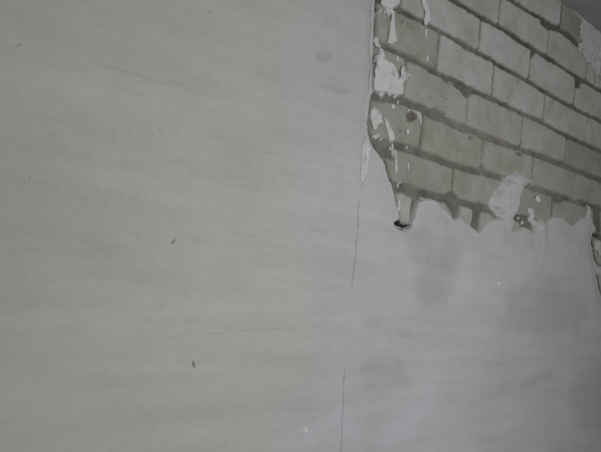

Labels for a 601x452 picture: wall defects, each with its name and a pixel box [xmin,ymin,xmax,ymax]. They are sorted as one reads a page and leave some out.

spalling [367,0,601,266]